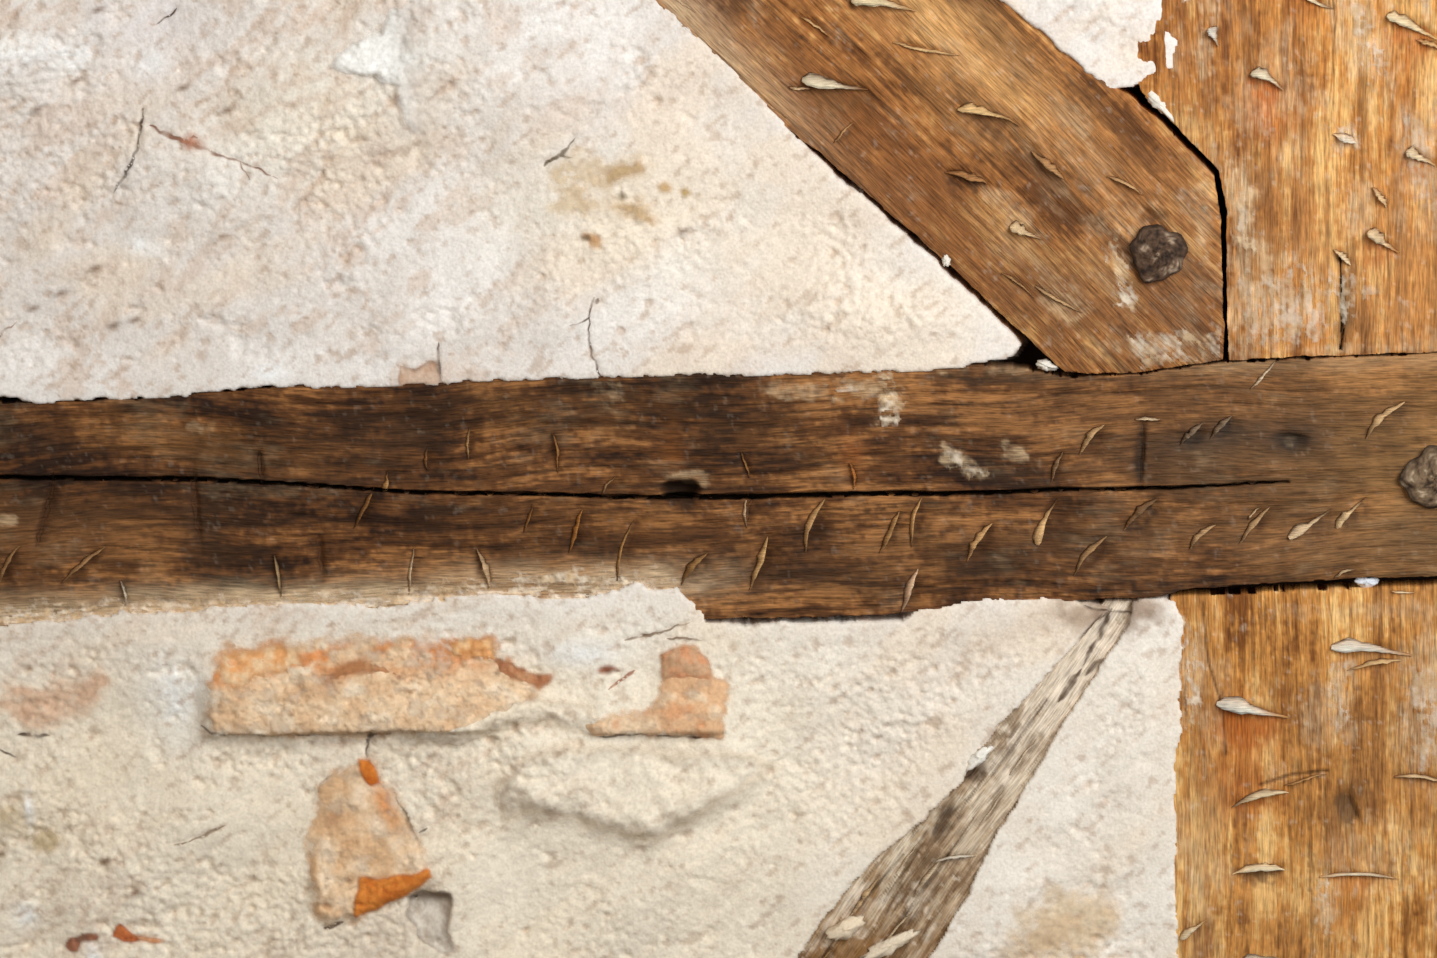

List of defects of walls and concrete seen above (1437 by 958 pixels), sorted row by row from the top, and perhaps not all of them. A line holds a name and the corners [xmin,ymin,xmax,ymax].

crack [113,113,276,194]
crack [0,455,1285,523]
spalling [208,634,552,738]
spalling [586,645,729,739]
spalling [306,759,454,953]